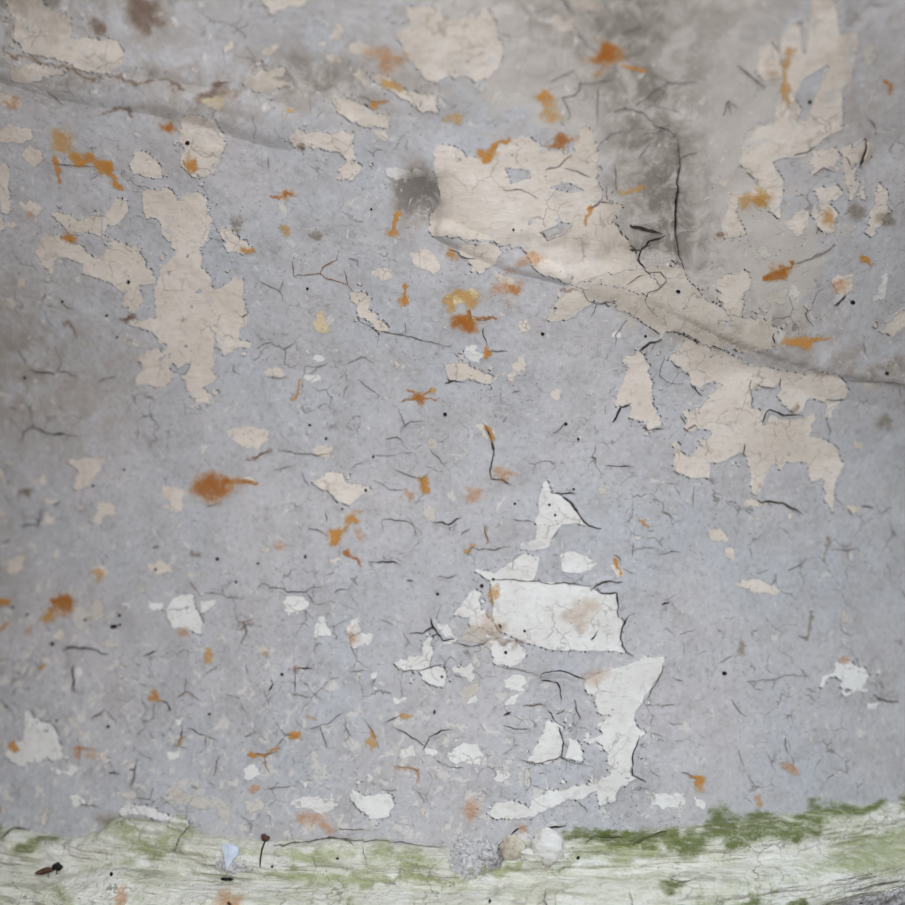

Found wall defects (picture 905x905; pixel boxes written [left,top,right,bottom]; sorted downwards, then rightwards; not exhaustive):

rust [52,131,123,190]
peeling [719,0,893,240]
peeling [0,96,254,409]
crack [546,70,698,347]
rust [442,289,497,333]
peeling [386,124,850,514]
crack [638,332,723,396]
crack [484,390,520,484]
rust [192,472,258,501]
rust [42,594,73,621]
peeling [392,480,676,821]
water stain [572,828,682,851]